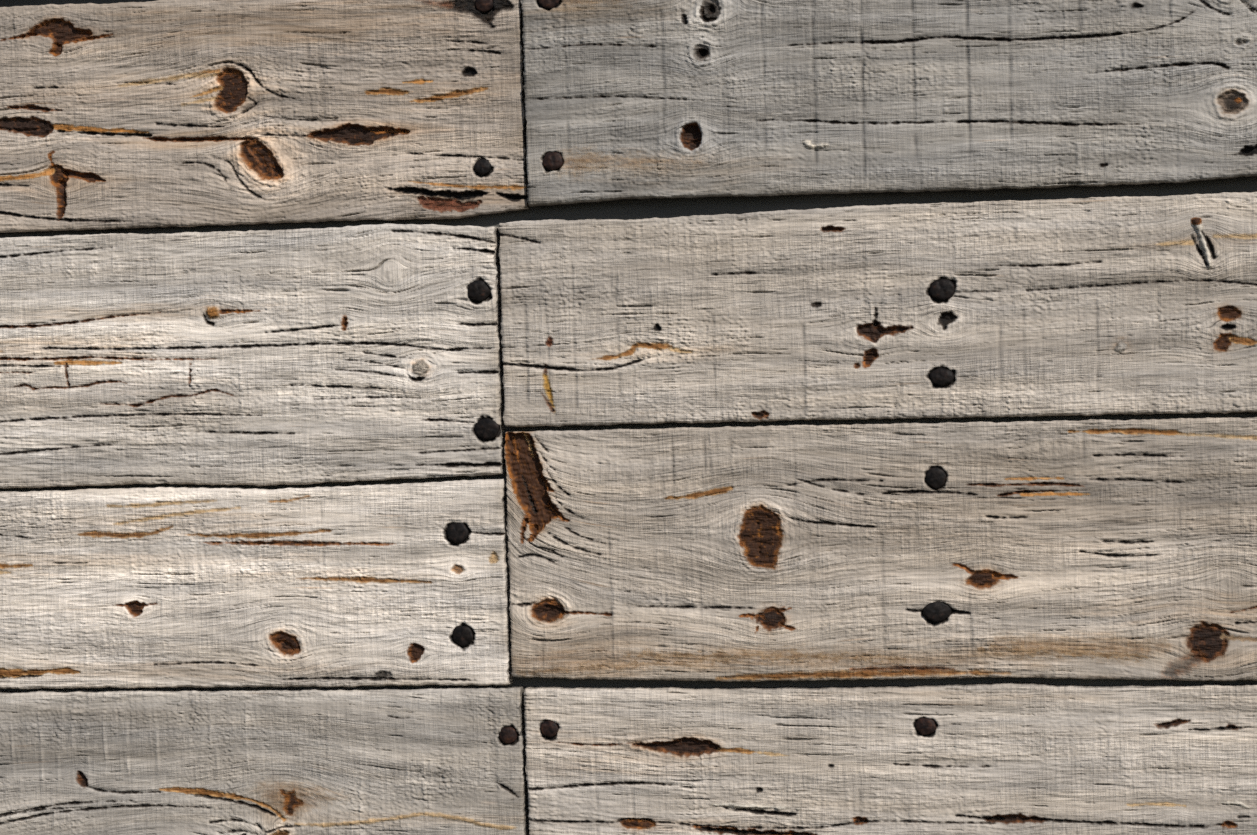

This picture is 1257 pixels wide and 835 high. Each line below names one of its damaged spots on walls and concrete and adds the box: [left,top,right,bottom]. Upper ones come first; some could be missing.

crack [0,183,121,258]
crack [472,436,603,563]
crack [0,785,293,835]